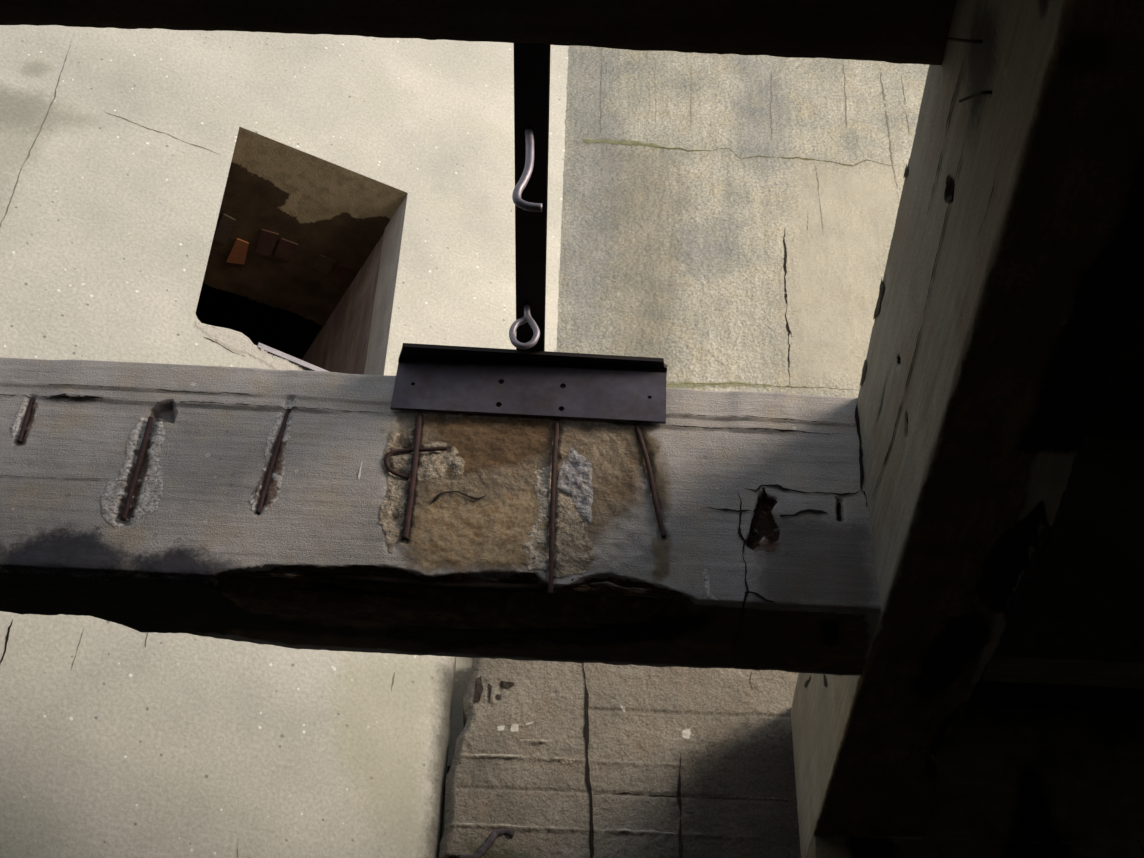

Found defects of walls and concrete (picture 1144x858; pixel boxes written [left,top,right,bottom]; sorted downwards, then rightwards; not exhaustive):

crack [0,45,71,227]
damp [0,527,241,583]
corrosion [118,439,150,519]
spalling [100,399,178,527]
crack [0,384,378,413]
corrosion [256,437,286,506]
spalling [249,398,298,515]
spalling [216,421,691,629]
corrosion [389,413,668,574]
spalling [746,496,780,550]
crack [576,53,970,688]
crack [583,664,718,858]